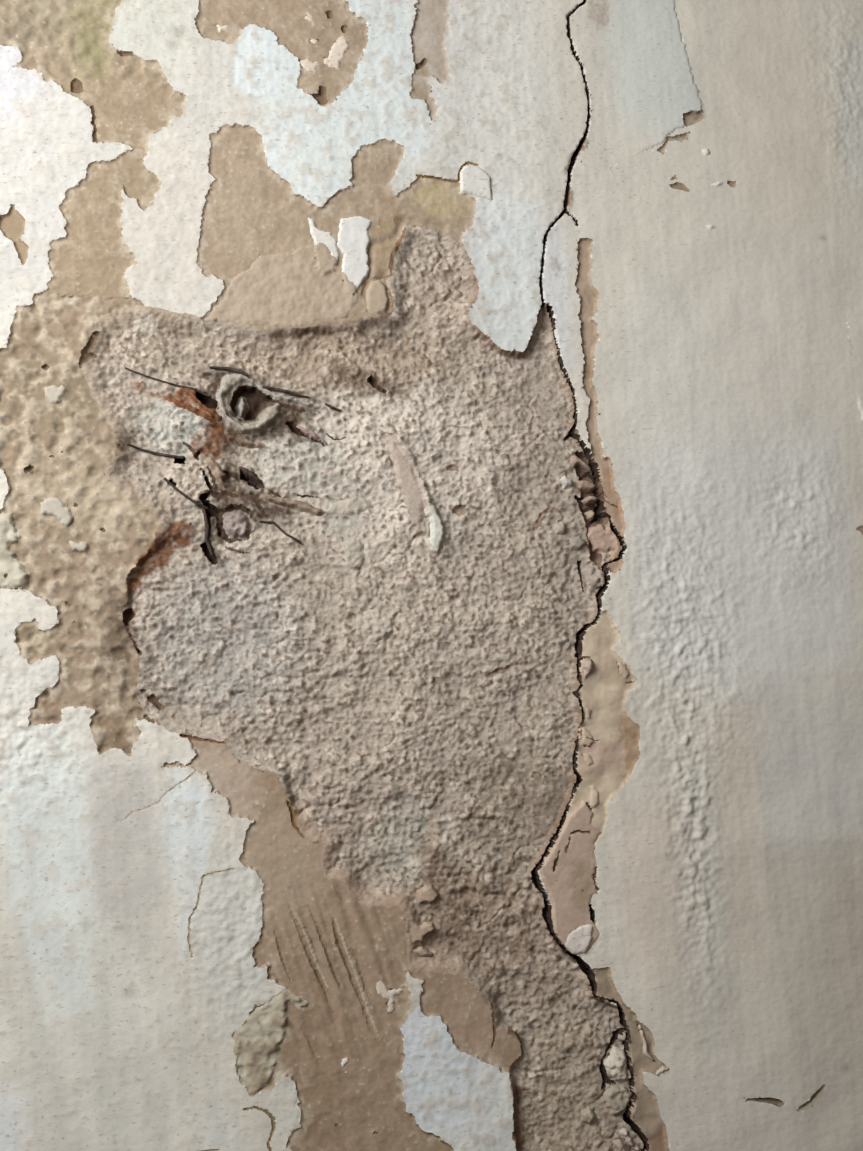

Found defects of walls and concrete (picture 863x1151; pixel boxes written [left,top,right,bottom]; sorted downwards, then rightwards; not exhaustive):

peeling [657,110,705,154]
peeling [670,176,690,192]
rust [168,388,232,459]
rust [127,521,192,595]
spalling [0,0,670,1151]
crack [531,0,649,1151]